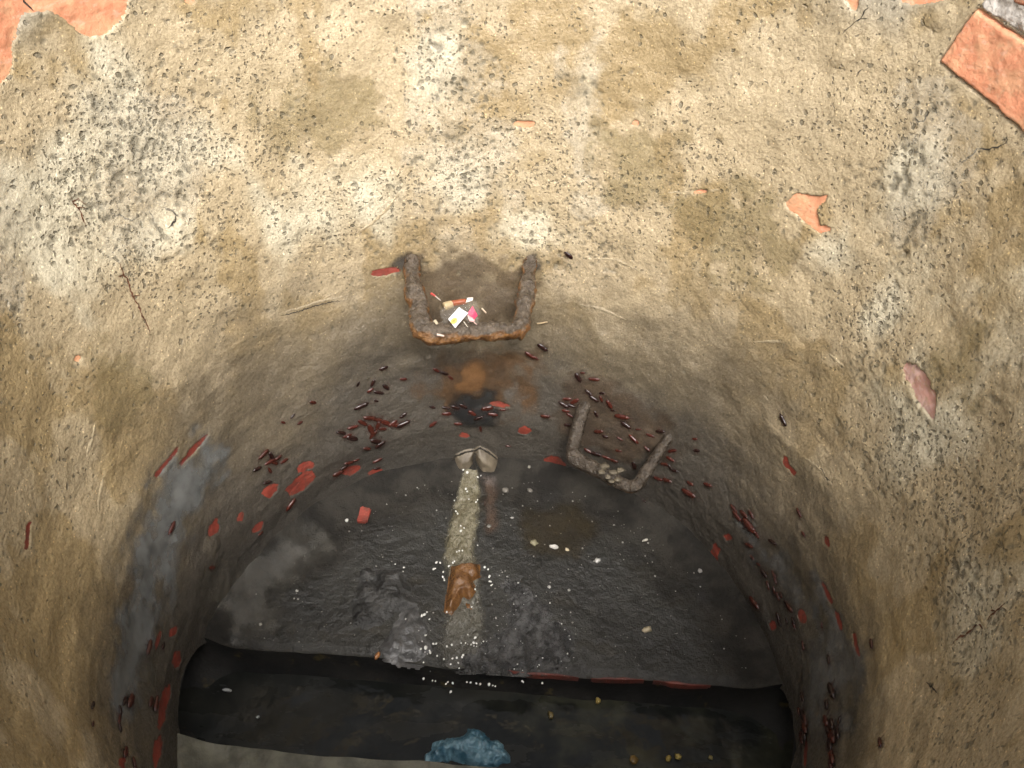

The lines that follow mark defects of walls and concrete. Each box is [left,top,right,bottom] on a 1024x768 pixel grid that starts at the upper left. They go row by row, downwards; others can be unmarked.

flaking render [0,0,127,83]
flaking render [786,193,831,233]
crack [118,264,150,331]
water stain [112,447,228,717]